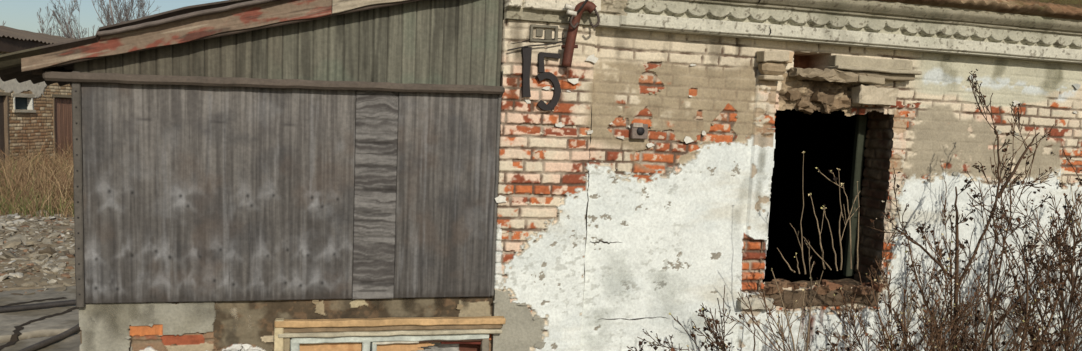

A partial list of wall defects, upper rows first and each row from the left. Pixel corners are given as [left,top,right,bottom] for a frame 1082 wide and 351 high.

peeling [0,78,47,98]
peeling [898,64,1082,185]
peeling [495,54,761,268]
peeling [653,251,692,290]
spalling [125,323,207,351]
peeling [222,343,266,351]
peeling [517,300,558,349]